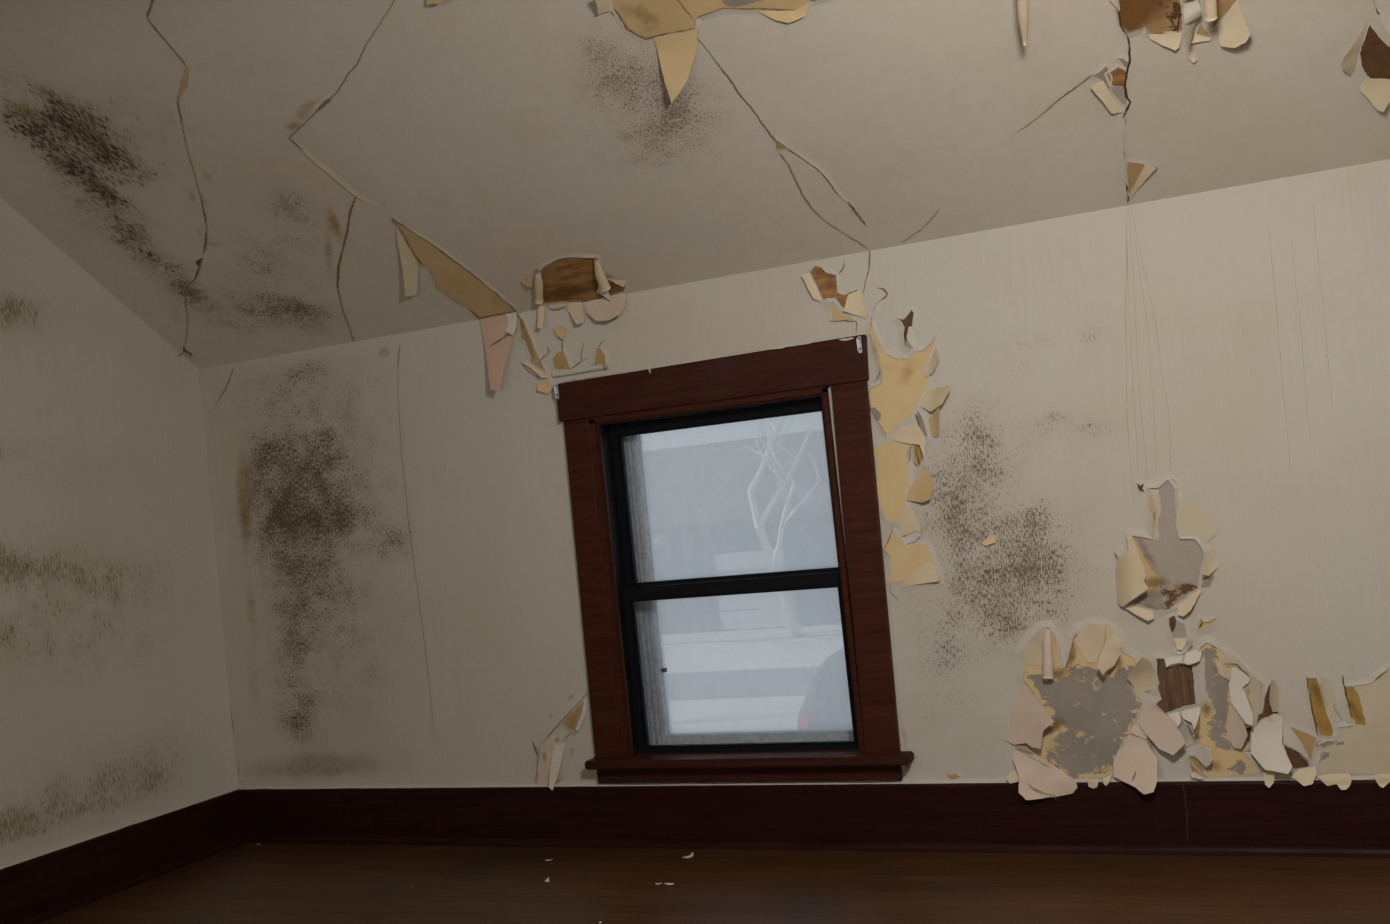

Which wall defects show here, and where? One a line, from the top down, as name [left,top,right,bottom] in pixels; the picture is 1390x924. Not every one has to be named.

water stain [1119,0,1182,32]
water stain [0,70,352,342]
crack [147,0,209,356]
crack [678,0,889,382]
water stain [0,529,175,687]
water stain [228,357,415,754]
flaking render [916,411,928,437]
water stain [905,207,1171,732]
flaking render [1132,480,1204,637]